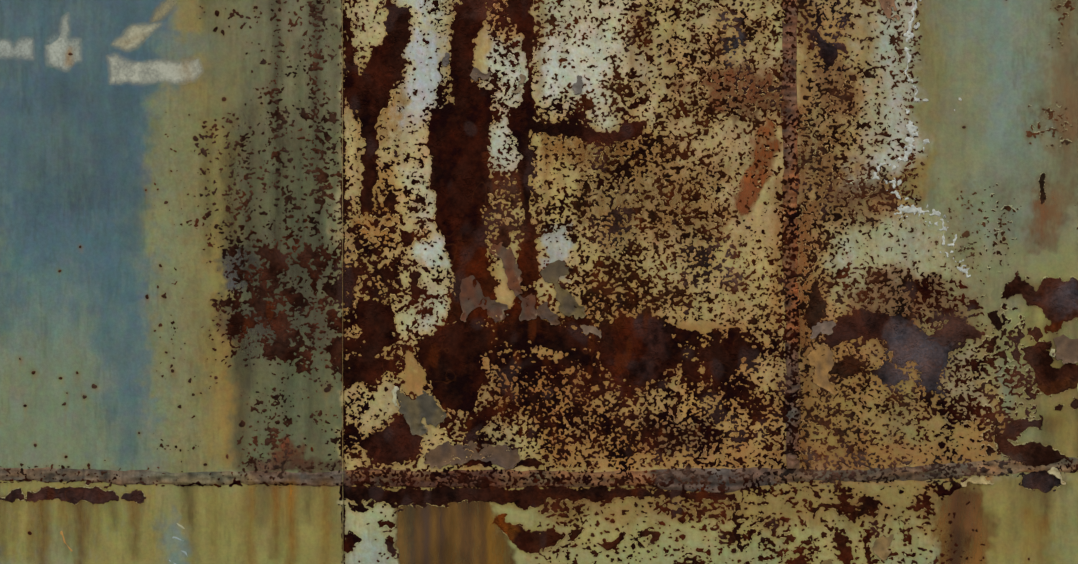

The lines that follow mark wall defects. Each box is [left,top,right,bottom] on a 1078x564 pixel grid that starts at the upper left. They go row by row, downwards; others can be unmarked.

rust [213,6,262,36]
spalling [263,0,781,352]
rust [819,202,938,276]
spalling [797,0,979,333]
rust [940,183,1022,284]
rust [1038,173,1047,204]
spalling [388,301,787,470]
spalling [797,321,991,469]
peeling [1001,272,1078,411]
rust [0,455,121,483]
rust [174,465,252,490]
peeling [992,432,1066,493]